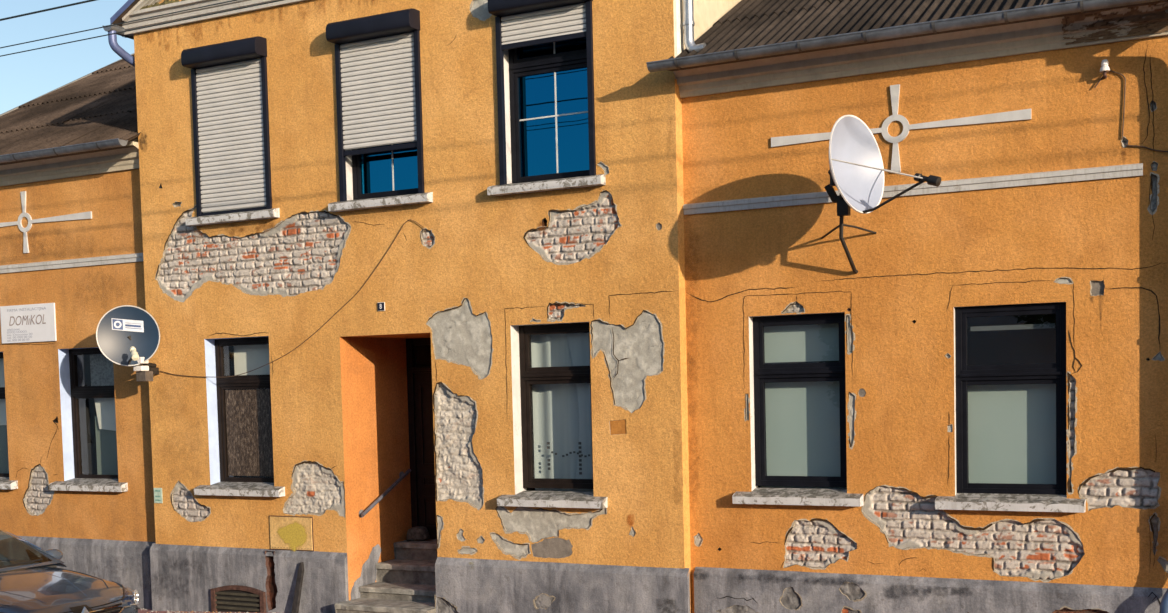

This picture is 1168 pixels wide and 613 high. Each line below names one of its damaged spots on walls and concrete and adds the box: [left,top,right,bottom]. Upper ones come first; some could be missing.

crack [1137,46,1155,149]
flaking render [155,201,351,302]
flaking render [523,190,622,265]
crack [575,182,1160,385]
flaking render [426,298,494,380]
flaking render [590,310,665,435]
flaking render [23,464,54,516]
flaking render [283,460,345,518]
flaking render [433,382,607,560]
flaking render [783,518,857,570]
flaking render [861,485,1085,582]
flaking render [1066,371,1168,573]